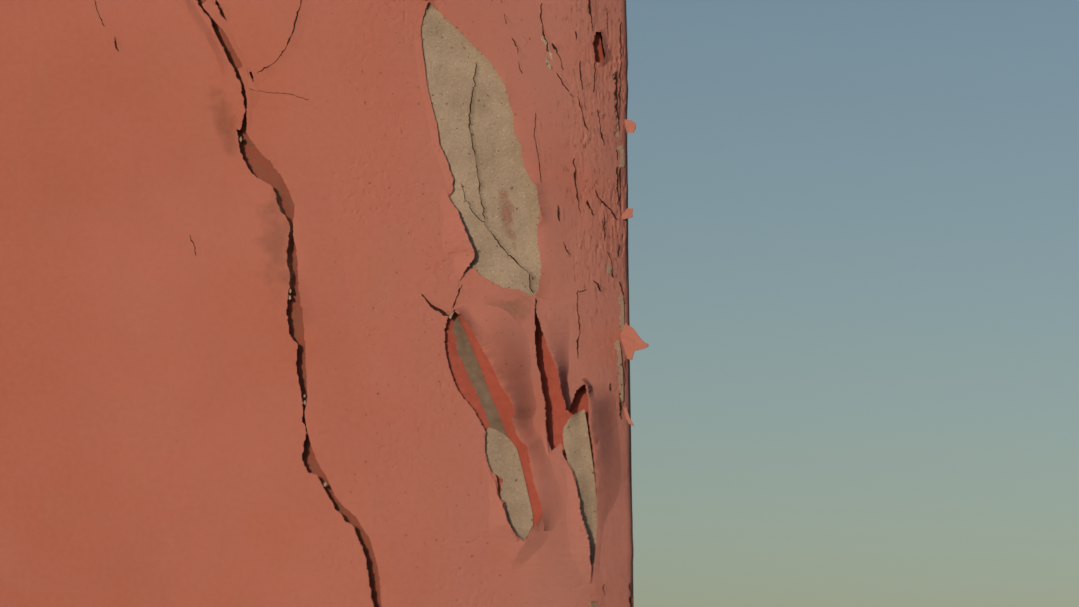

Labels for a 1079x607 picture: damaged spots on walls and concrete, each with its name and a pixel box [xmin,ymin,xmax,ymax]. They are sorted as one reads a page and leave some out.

crack [501,0,613,146]
peeling [624,119,636,133]
crack [183,0,437,607]
crack [421,290,454,316]
peeling [414,0,634,607]
crack [534,112,627,359]
peeling [620,322,649,360]